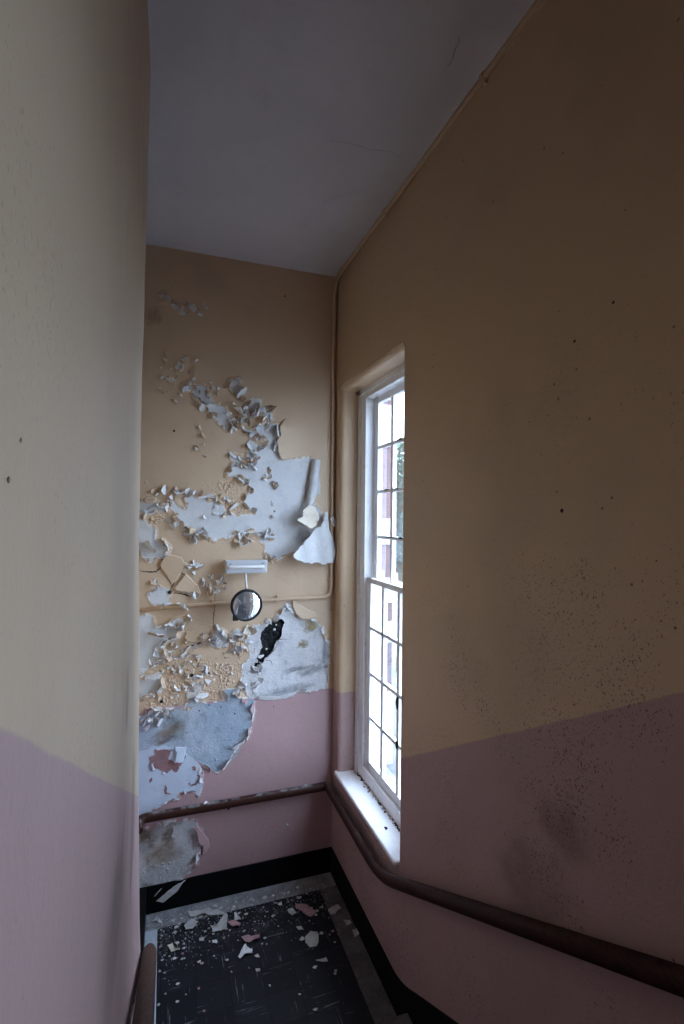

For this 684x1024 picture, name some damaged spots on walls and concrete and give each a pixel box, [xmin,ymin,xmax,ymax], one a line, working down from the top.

peeling [139,350,336,565]
peeling [138,560,332,903]